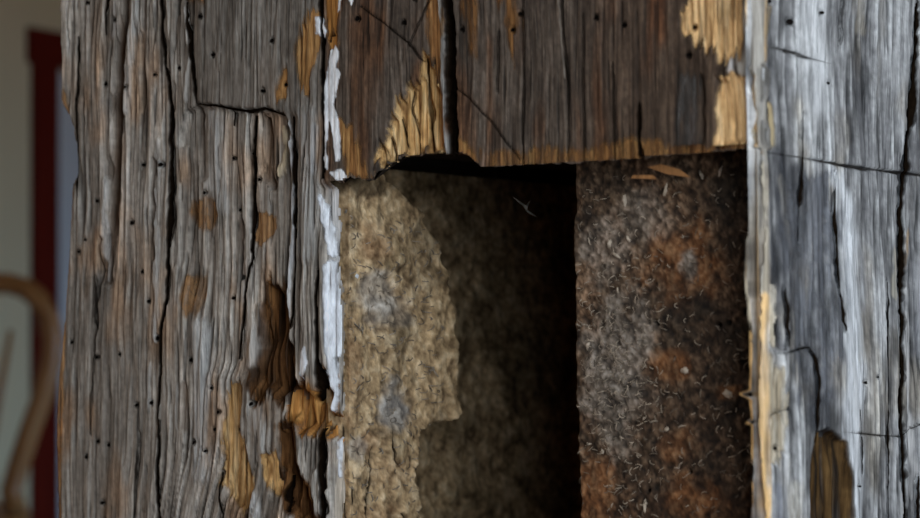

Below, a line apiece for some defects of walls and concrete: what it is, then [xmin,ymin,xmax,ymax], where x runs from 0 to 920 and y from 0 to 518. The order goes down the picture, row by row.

peeling [315,17,347,181]
crack [392,0,524,163]
peeling [714,70,757,146]
crack [796,110,804,242]
crack [133,0,330,518]
peeling [299,346,308,380]
peeling [318,194,345,477]
peeling [744,264,752,323]
crack [832,184,847,331]
crack [886,0,920,518]
peeling [261,421,320,518]
crack [318,427,399,518]